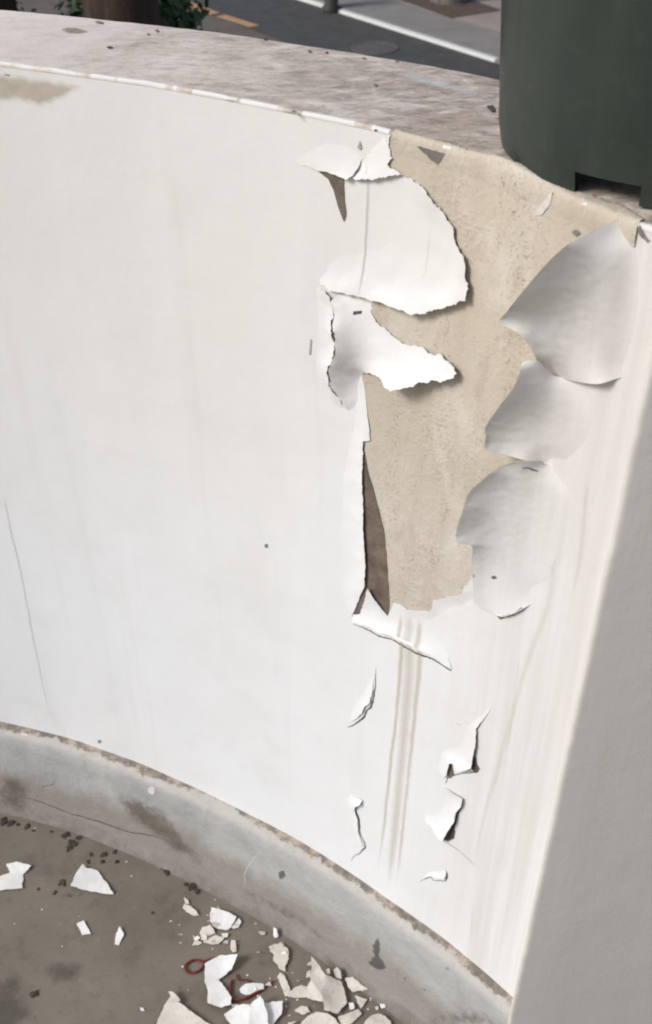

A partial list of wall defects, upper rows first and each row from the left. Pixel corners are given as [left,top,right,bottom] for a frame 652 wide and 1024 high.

damp [0,79,67,101]
peeling [316,129,650,620]
crack [348,794,366,859]